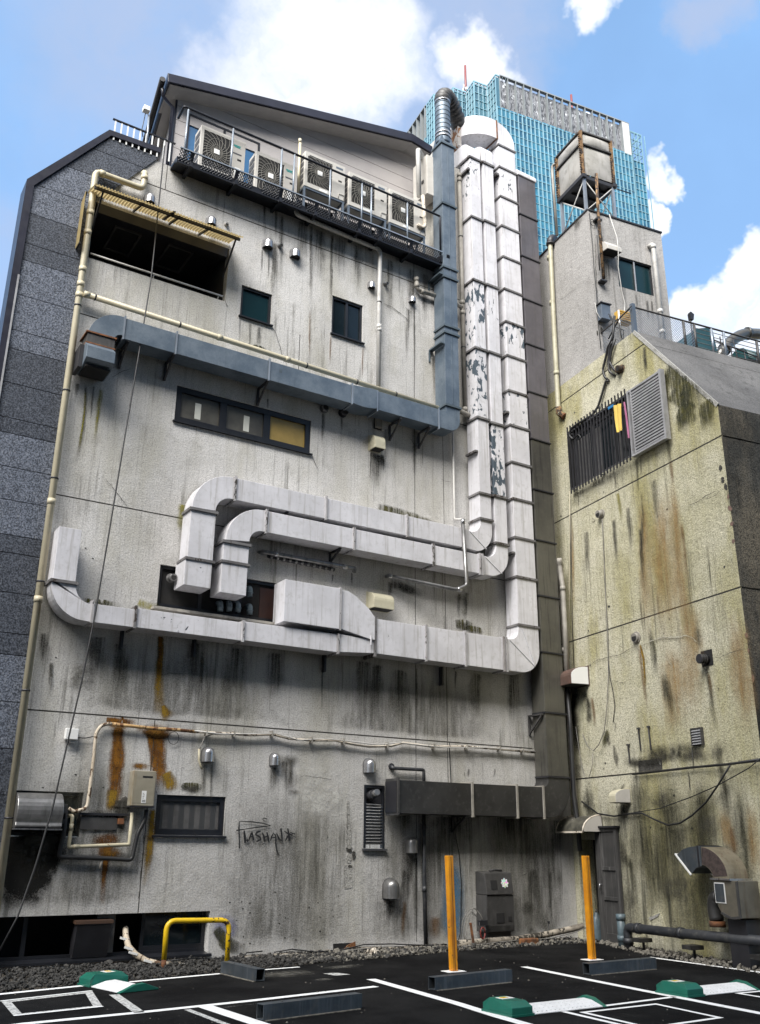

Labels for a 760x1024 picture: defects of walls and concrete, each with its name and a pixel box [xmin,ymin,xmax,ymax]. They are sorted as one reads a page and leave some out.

damp [77,384,102,438]
damp [665,367,714,427]
rust [106,637,196,809]
damp [2,835,63,905]
rust [145,810,155,867]
damp [622,785,685,896]
damp [694,766,756,872]